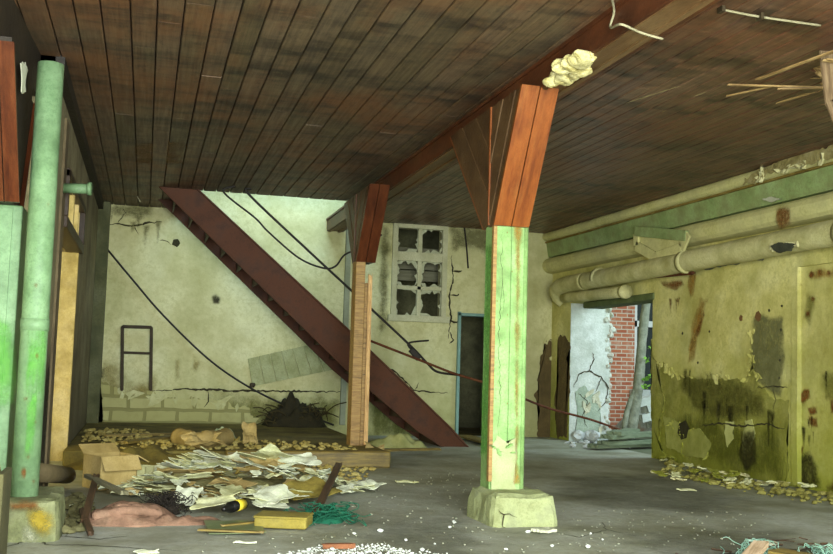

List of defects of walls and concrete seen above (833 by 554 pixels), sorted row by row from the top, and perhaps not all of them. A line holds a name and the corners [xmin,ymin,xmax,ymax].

corrosion [776,208,790,229]
crack [448,256,461,344]
corrosion [689,302,704,361]
crack [574,354,609,426]
peeling [650,311,790,481]
damp [682,371,779,476]
crack [701,385,787,453]